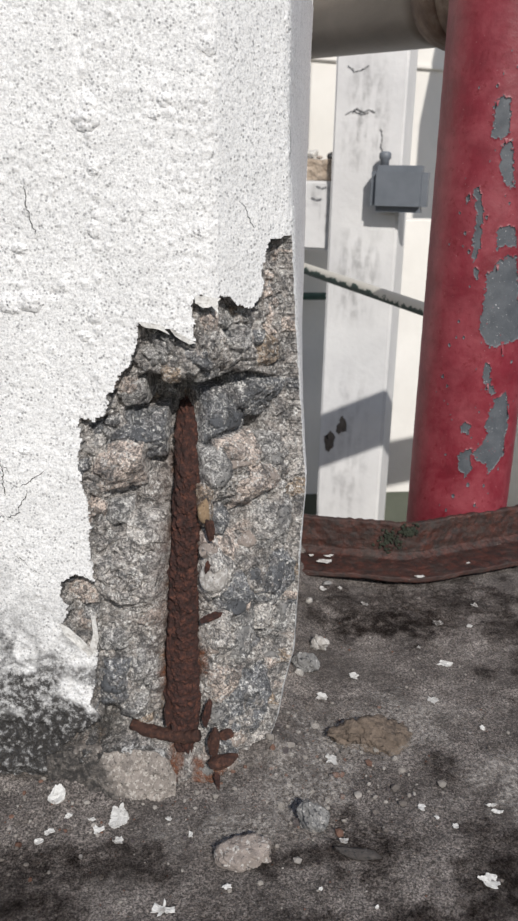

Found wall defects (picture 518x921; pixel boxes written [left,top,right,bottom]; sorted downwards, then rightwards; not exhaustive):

peeling [489,73,516,205]
peeling [459,186,518,364]
spalling [59,234,333,791]
peeling [444,362,509,487]